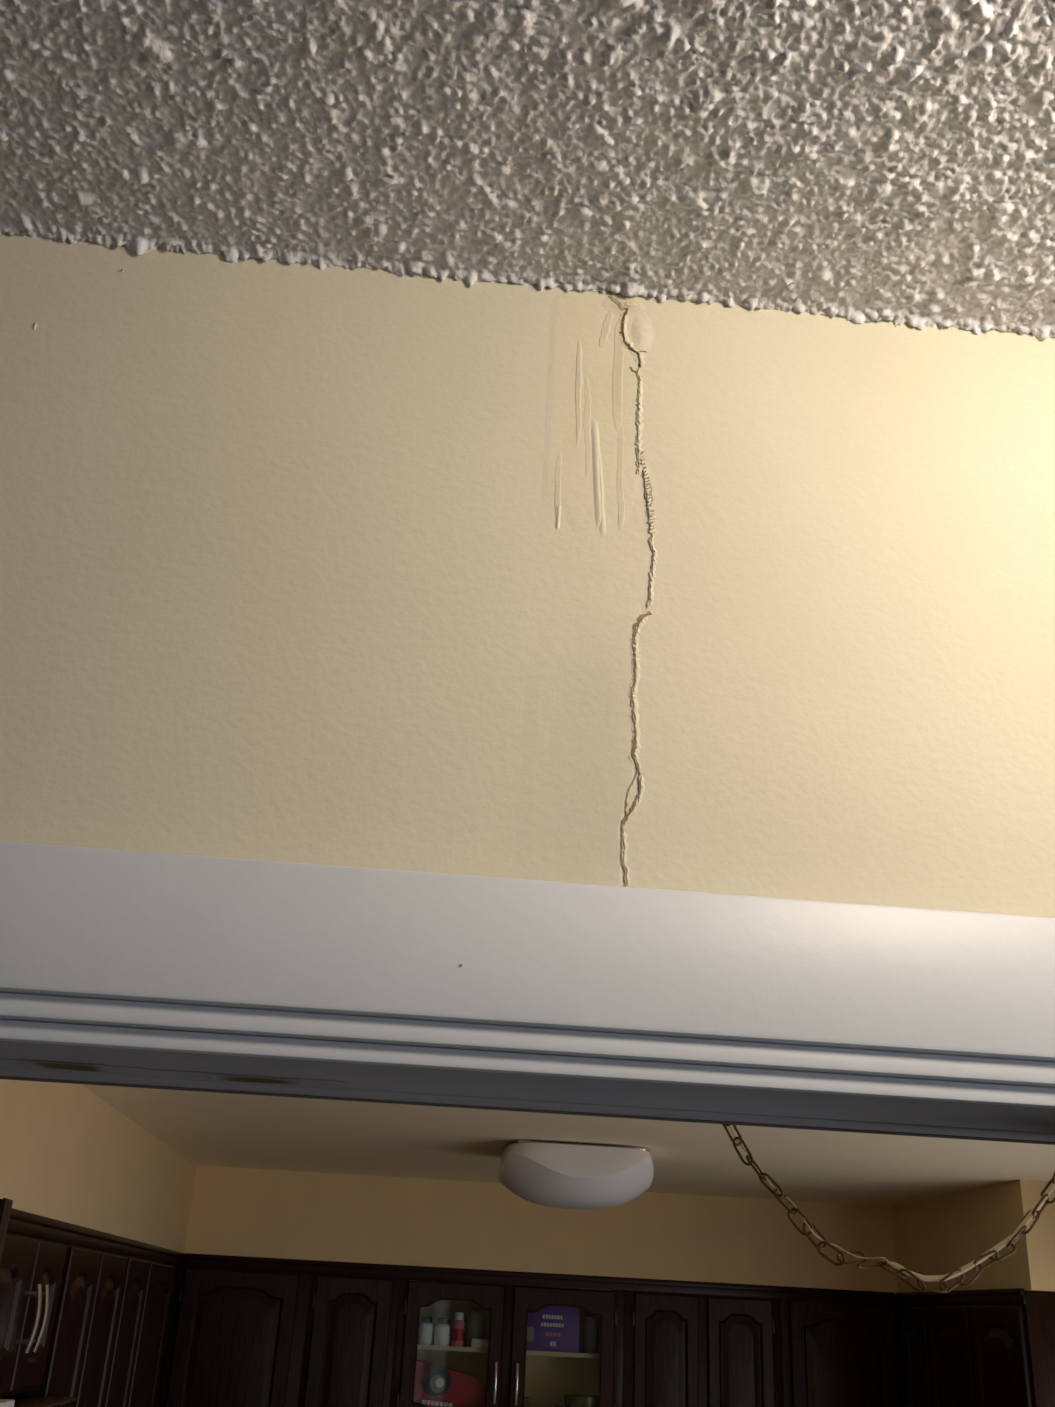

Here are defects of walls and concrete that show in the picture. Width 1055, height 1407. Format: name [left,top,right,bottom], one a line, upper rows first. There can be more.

crack [609,295,658,887]